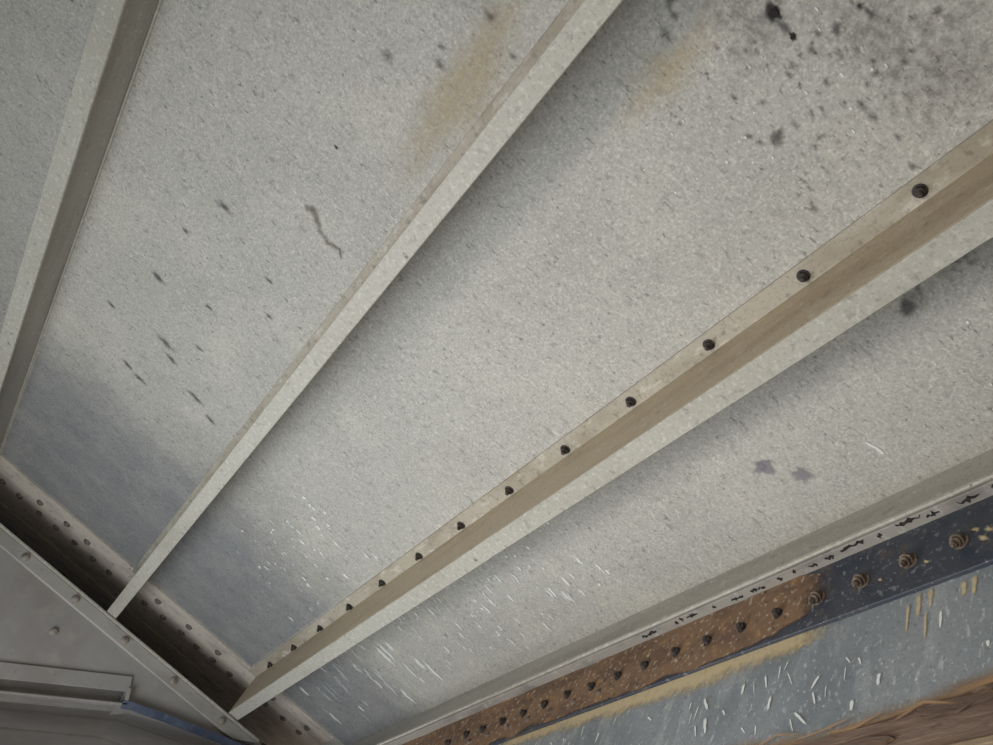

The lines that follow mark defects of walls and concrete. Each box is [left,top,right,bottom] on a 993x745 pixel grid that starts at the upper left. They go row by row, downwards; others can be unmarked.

peeling [808,539,863,567]
peeling [895,511,941,526]
rust [402,573,821,745]
rust [759,674,993,745]